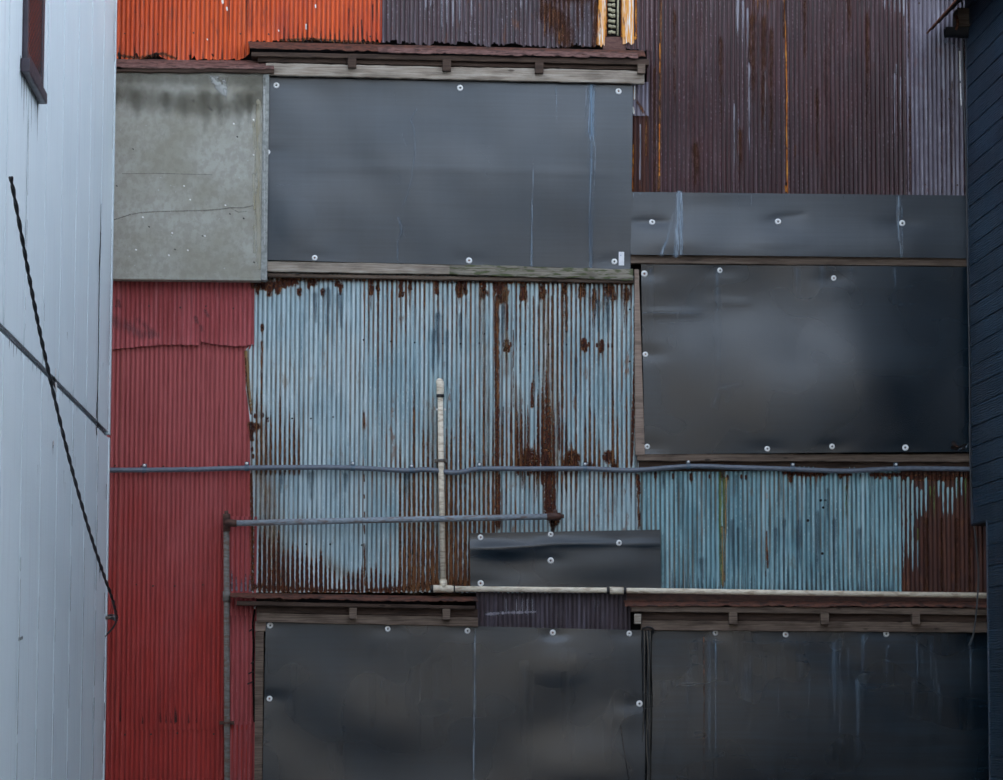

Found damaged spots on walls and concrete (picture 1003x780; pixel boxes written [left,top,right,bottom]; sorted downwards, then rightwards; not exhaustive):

water stain [122,76,261,270]
corrosion [753,0,796,194]
crack [73,204,258,429]
corrosion [244,277,641,596]
corrosion [782,471,970,491]